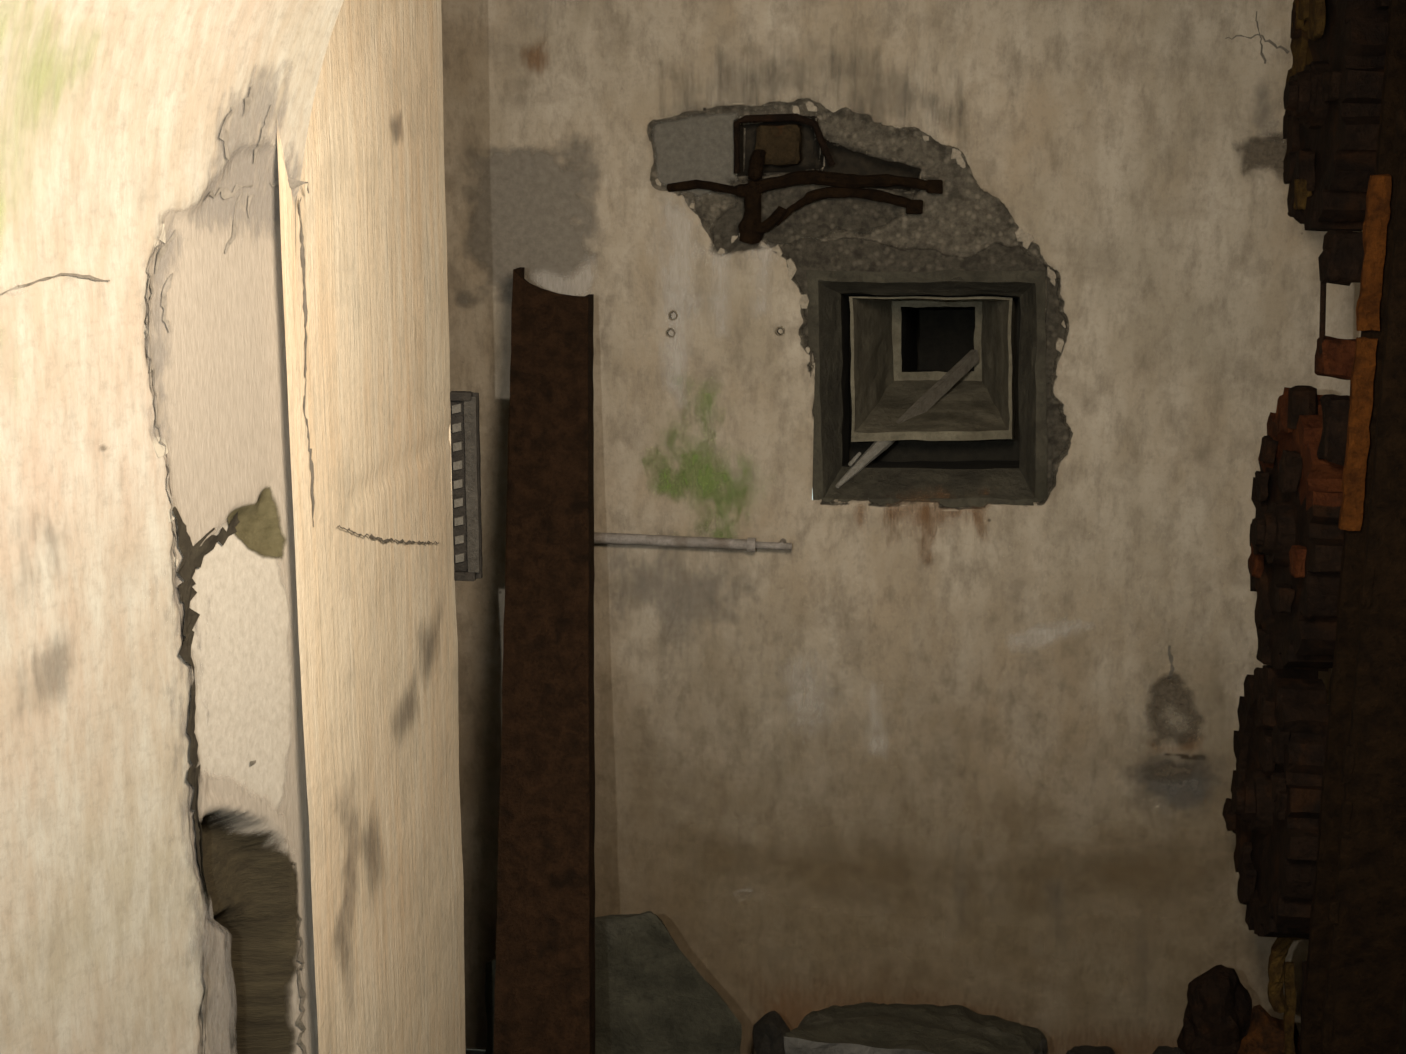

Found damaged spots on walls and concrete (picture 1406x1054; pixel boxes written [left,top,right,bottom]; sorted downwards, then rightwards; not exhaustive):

crack [2,273,110,295]
spalling [647,98,1073,505]
crack [173,507,240,891]
flaking render [143,74,319,1054]